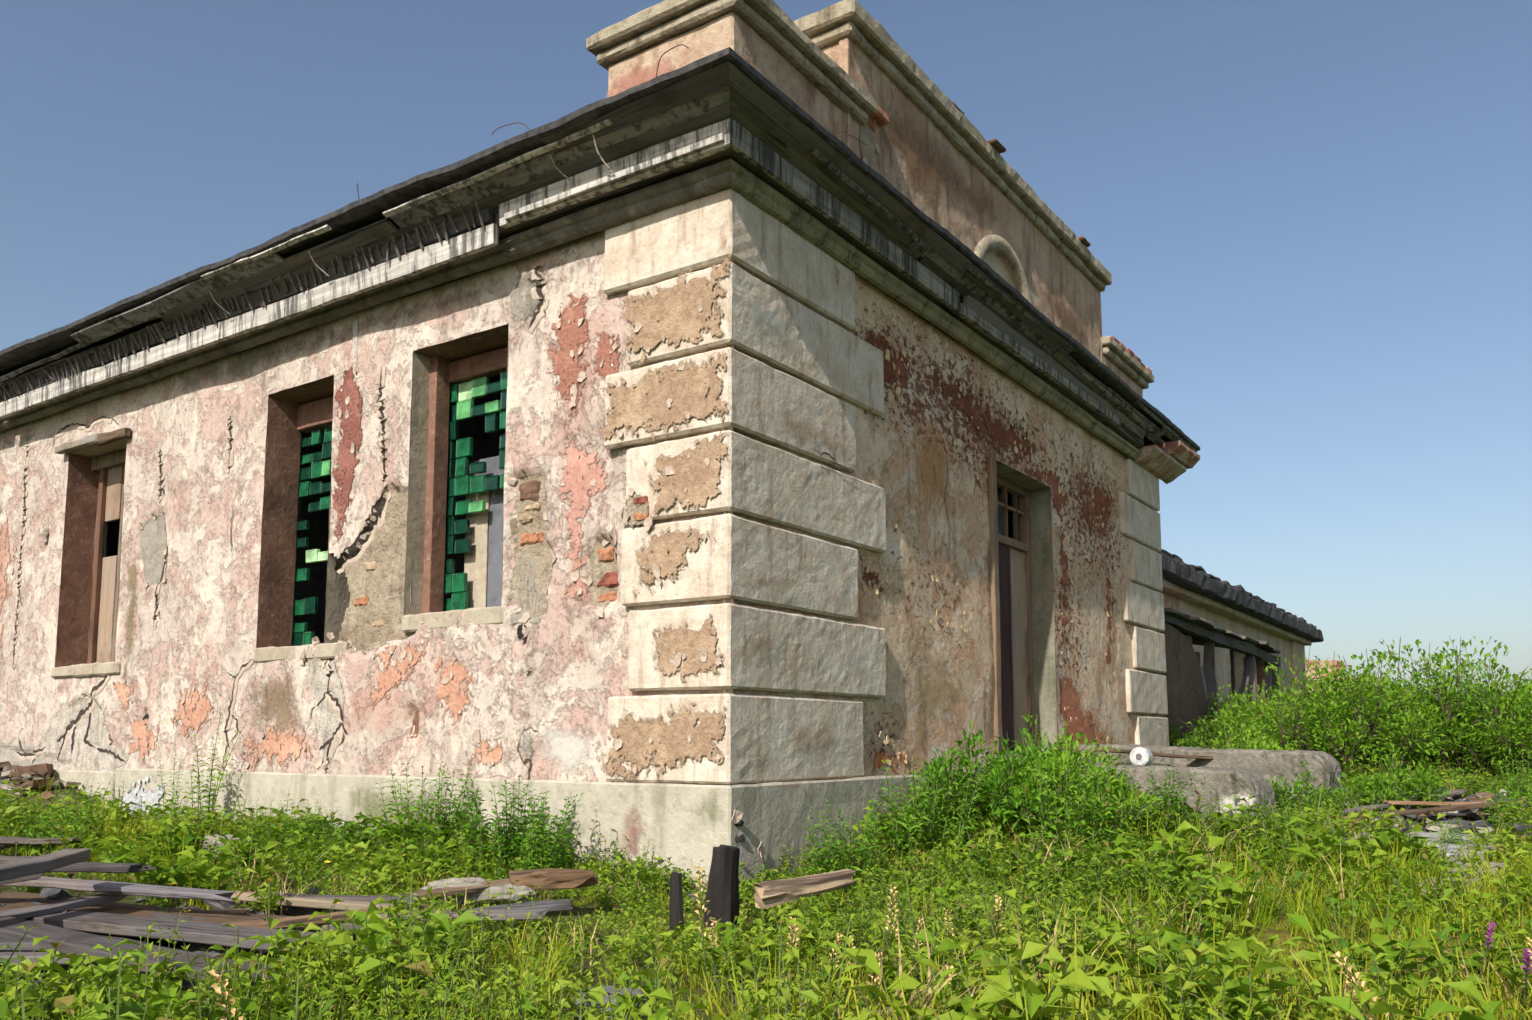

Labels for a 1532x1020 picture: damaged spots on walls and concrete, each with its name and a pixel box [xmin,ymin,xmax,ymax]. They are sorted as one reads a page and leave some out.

peeling [546,292,621,417]
crack [12,416,118,669]
crack [157,449,165,504]
crack [334,366,390,574]
flaking render [242,364,504,769]
flaking render [506,436,653,625]
peeling [860,325,1119,690]
crack [15,675,125,763]
crack [221,659,254,771]
crack [308,658,347,774]
peeling [873,713,912,773]
peeling [1059,677,1116,754]